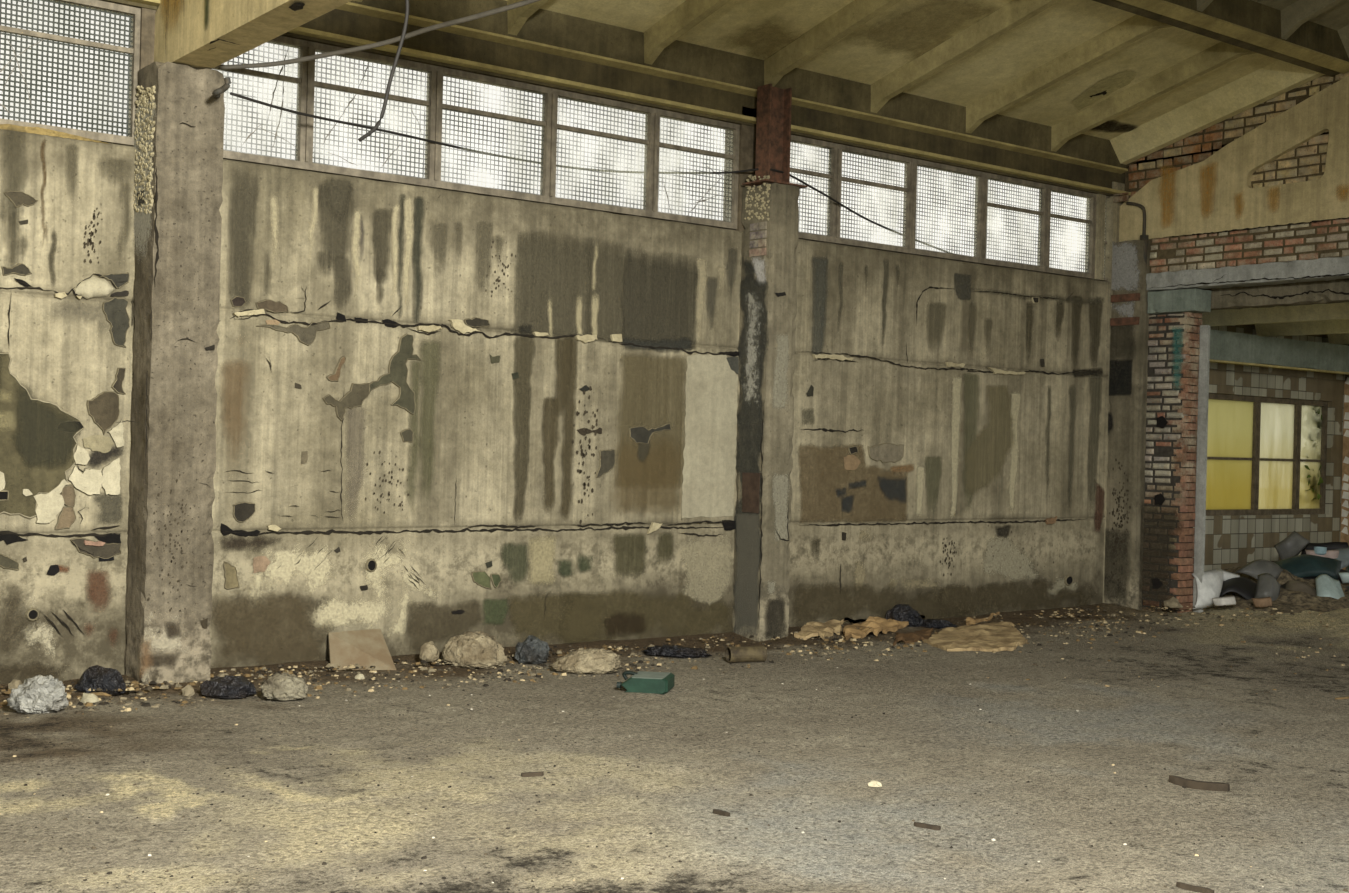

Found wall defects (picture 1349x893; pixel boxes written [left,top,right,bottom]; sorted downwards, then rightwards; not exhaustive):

leakage [230,179,257,303]
leakage [309,179,461,322]
spalling [0,553,27,570]
crack [0,278,84,352]
spalling [47,565,68,575]
crack [0,505,121,555]
peeling [0,352,126,561]
leakage [410,601,481,650]
crack [230,286,739,357]
leakage [513,236,766,518]
crack [221,387,1087,624]
peeling [727,222,789,634]